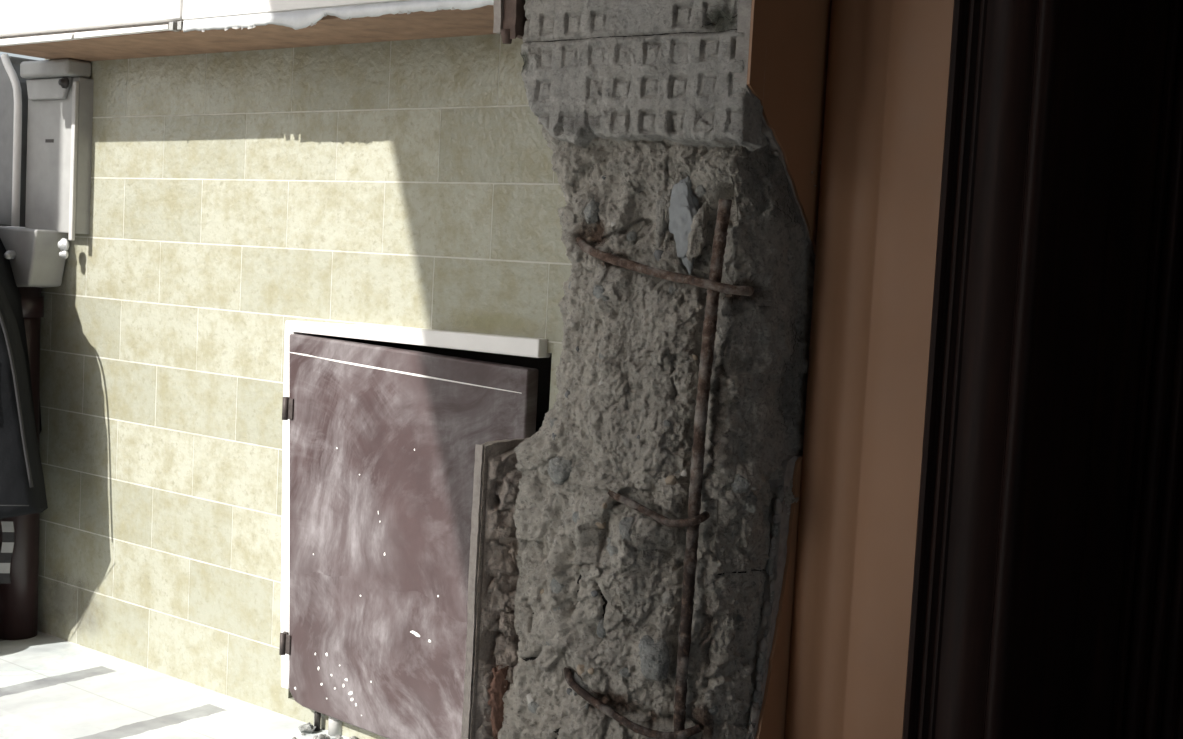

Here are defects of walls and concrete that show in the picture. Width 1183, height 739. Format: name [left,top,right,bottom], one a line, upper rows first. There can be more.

rust [579,221,605,247]
spalling [498,126,815,739]
rust [589,692,632,711]